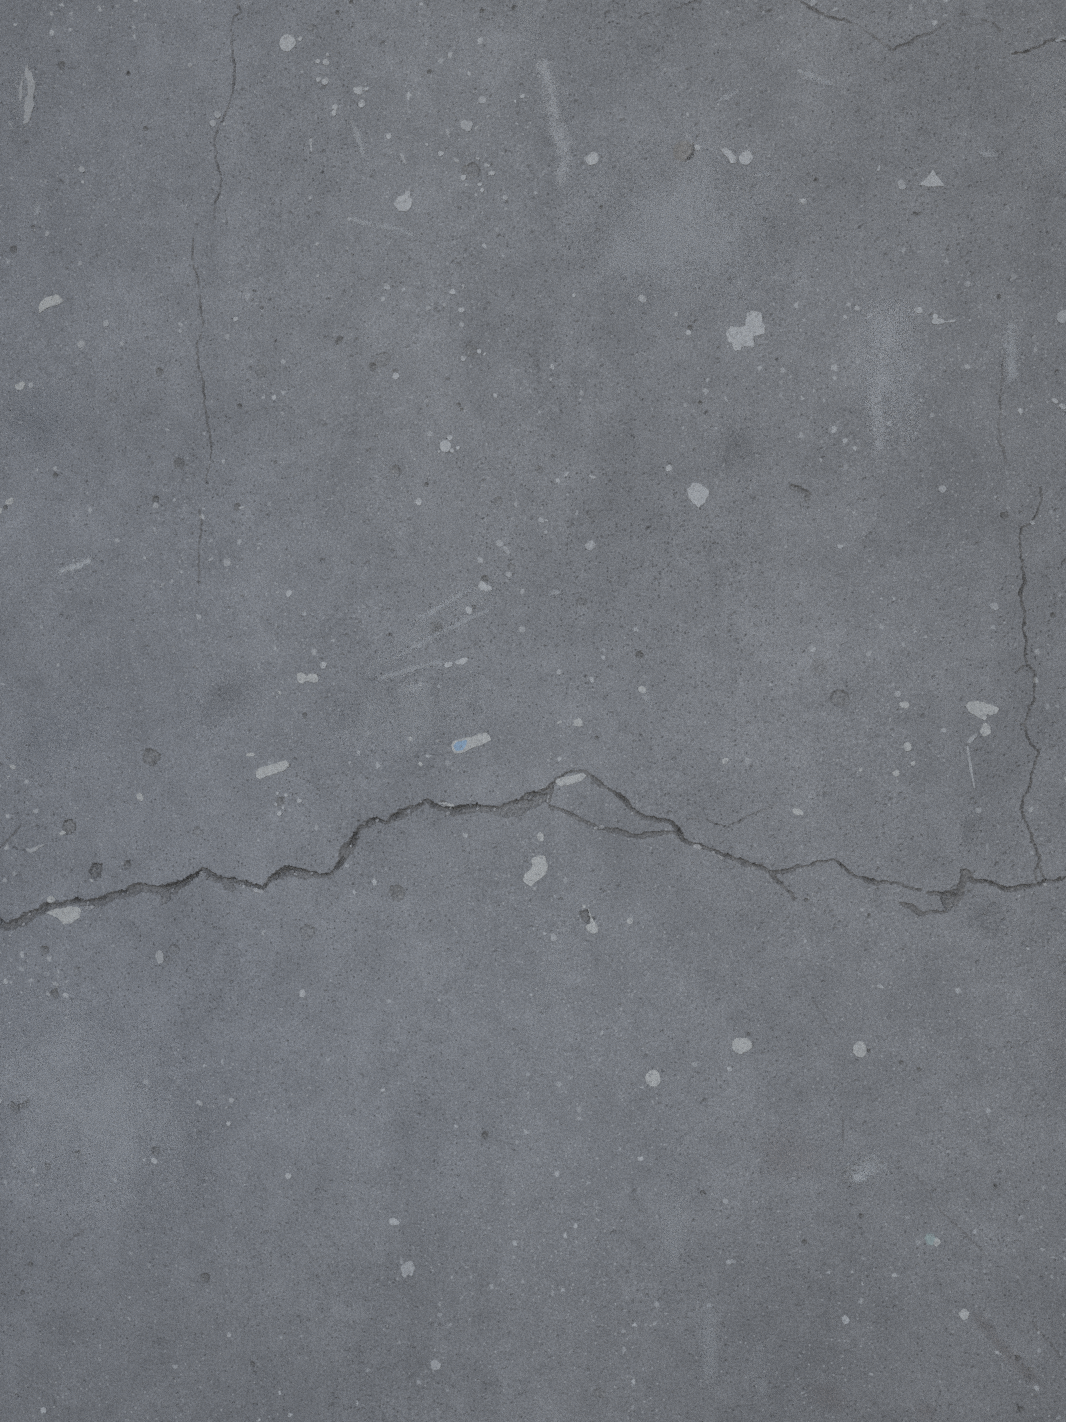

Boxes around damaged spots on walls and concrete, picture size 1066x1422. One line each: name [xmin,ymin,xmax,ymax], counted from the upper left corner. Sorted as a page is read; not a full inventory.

crack [609,0,700,24]
crack [798,0,1066,55]
crack [191,0,242,603]
crack [997,335,1010,464]
crack [0,487,1066,931]